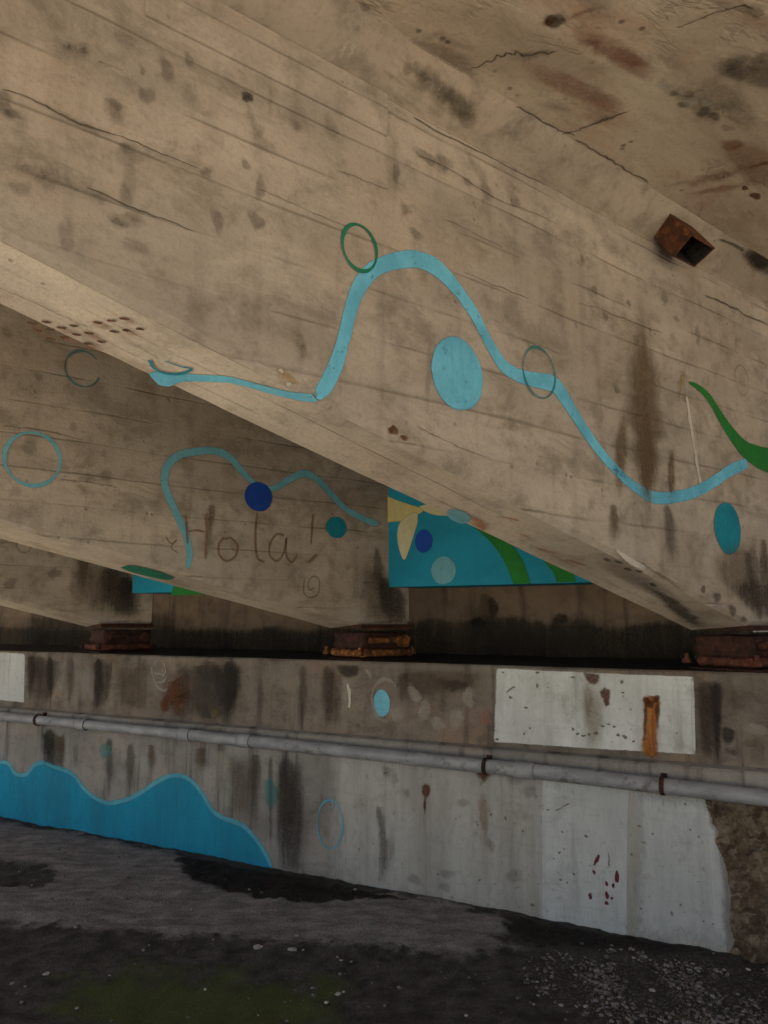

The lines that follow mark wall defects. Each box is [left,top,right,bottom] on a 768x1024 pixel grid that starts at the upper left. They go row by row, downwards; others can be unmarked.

crack [682,4,751,27]
crack [473,50,555,68]
crack [6,90,197,168]
crack [517,107,648,183]
crack [90,188,193,231]
leakage [617,337,660,490]
leakage [108,571,136,609]
leakage [0,583,768,700]
rust [584,673,610,706]
rust [642,695,660,757]
spalling [705,799,768,964]